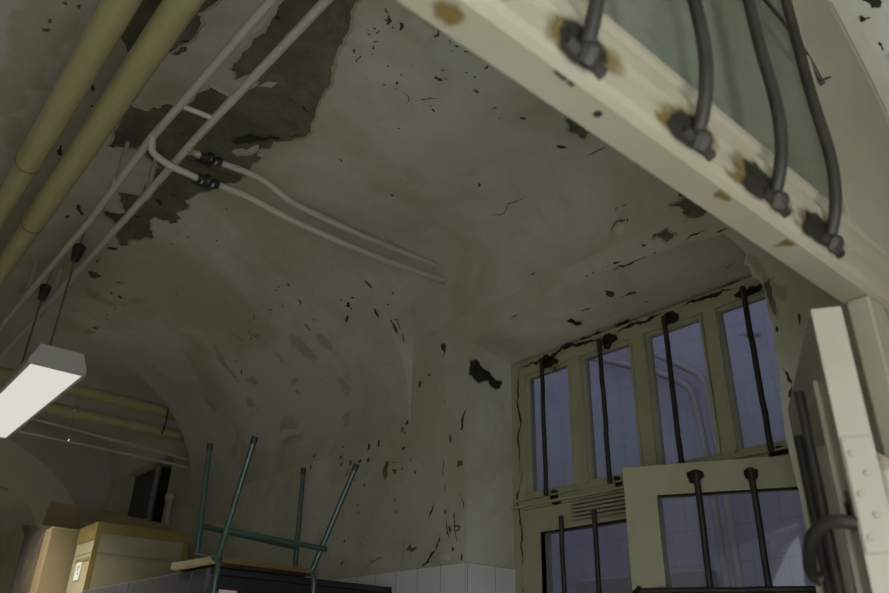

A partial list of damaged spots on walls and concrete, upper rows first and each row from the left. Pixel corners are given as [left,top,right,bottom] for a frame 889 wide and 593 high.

corrosion [434,2,464,25]
corrosion [551,19,586,68]
corrosion [596,41,622,71]
flaking render [102,0,361,250]
corrosion [656,107,694,148]
corrosion [726,154,771,203]
crack [685,288,733,305]
crack [516,312,665,593]
crack [422,460,464,567]